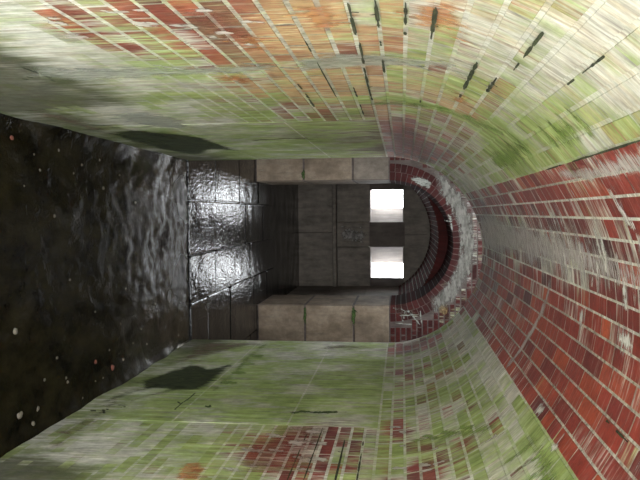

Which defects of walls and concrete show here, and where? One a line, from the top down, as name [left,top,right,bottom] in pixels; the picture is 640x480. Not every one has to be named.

crack [401,2,409,35]
crack [430,7,438,40]
crack [347,0,386,115]
crack [459,62,478,97]
crack [513,32,544,71]
crack [567,55,605,85]
water stain [113,113,228,154]
water stain [560,143,640,186]
water stain [433,175,640,311]
water stain [507,284,550,366]
water stain [616,322,633,355]
water stain [140,343,263,390]